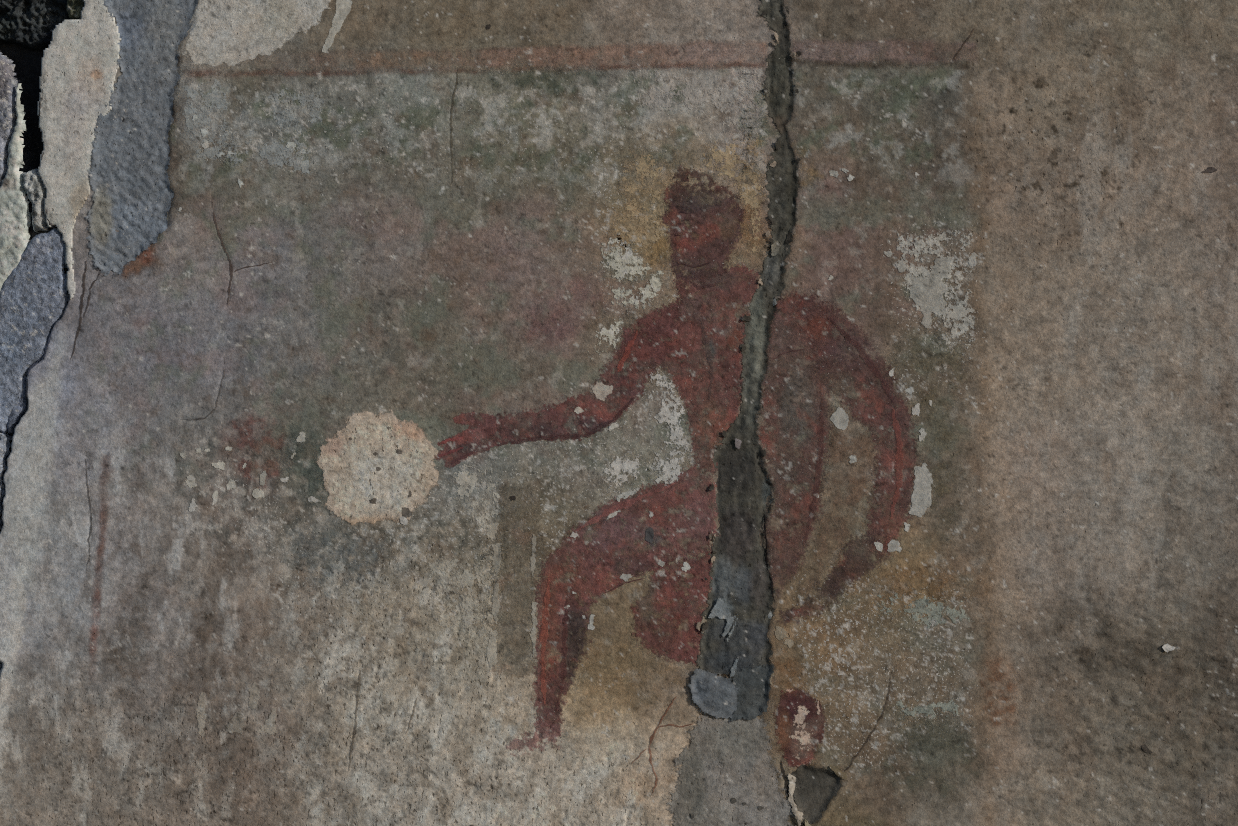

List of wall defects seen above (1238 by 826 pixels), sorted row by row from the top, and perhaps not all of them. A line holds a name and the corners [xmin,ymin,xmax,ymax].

peeling [588,154,664,359]
peeling [884,231,978,359]
crack [632,0,800,792]
spalling [400,491,412,525]
peeling [768,626,794,685]
spalling [788,701,847,826]